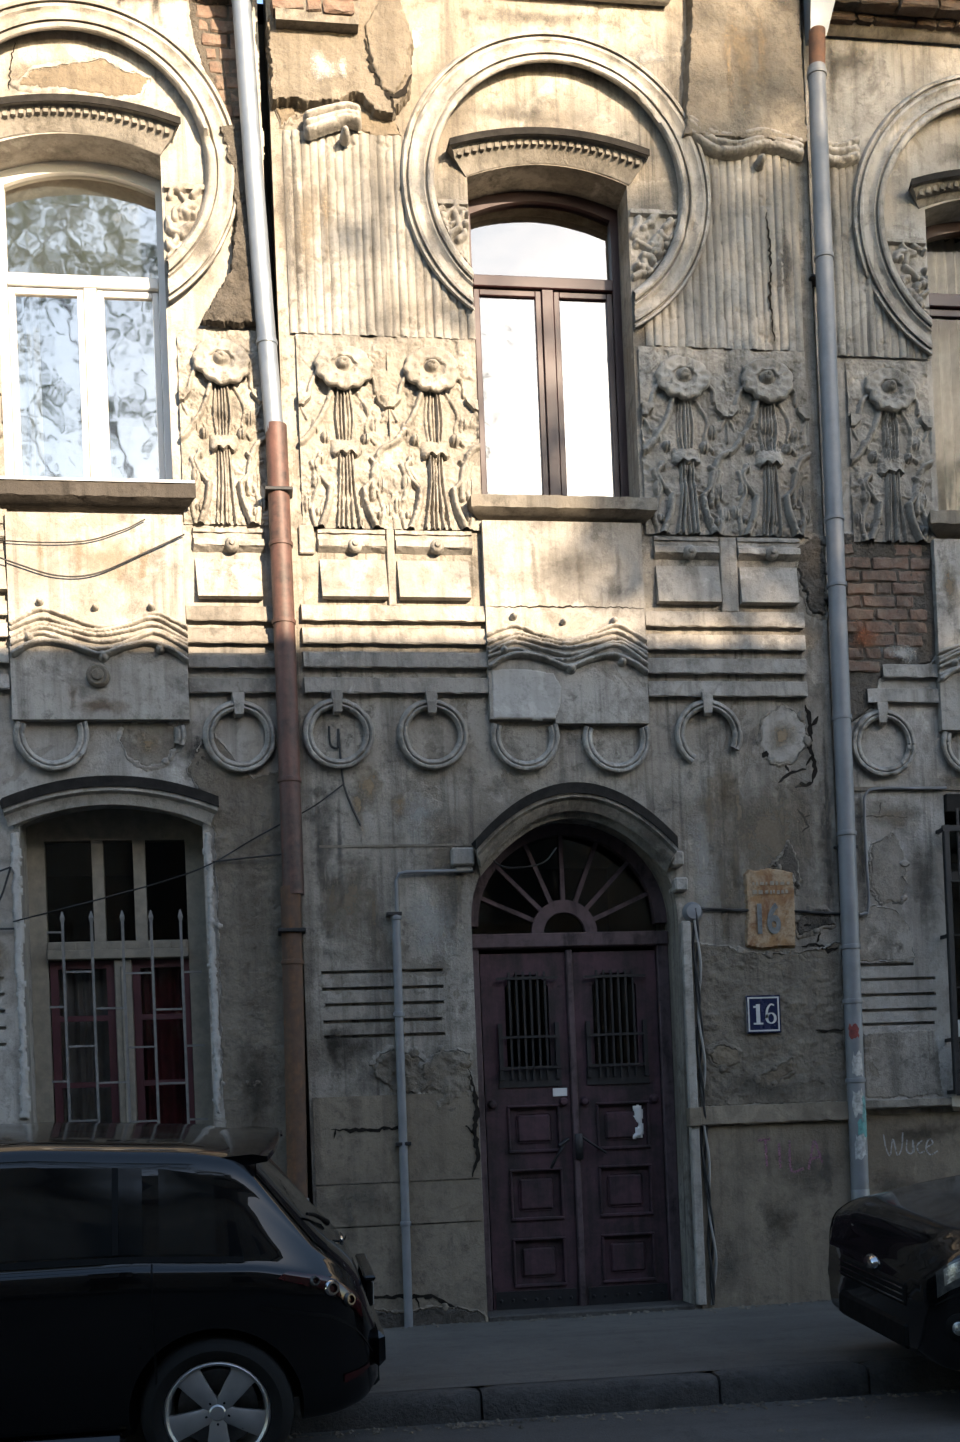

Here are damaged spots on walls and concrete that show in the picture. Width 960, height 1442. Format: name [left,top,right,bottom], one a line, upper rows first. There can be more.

flaking render [270,0,411,94]
flaking render [187,0,256,331]
flaking render [260,91,305,160]
flaking render [353,102,402,137]
flaking render [795,533,829,620]
flaking render [844,531,936,726]
crack [331,1126,398,1138]
crack [465,1074,481,1177]
crack [374,1294,467,1311]